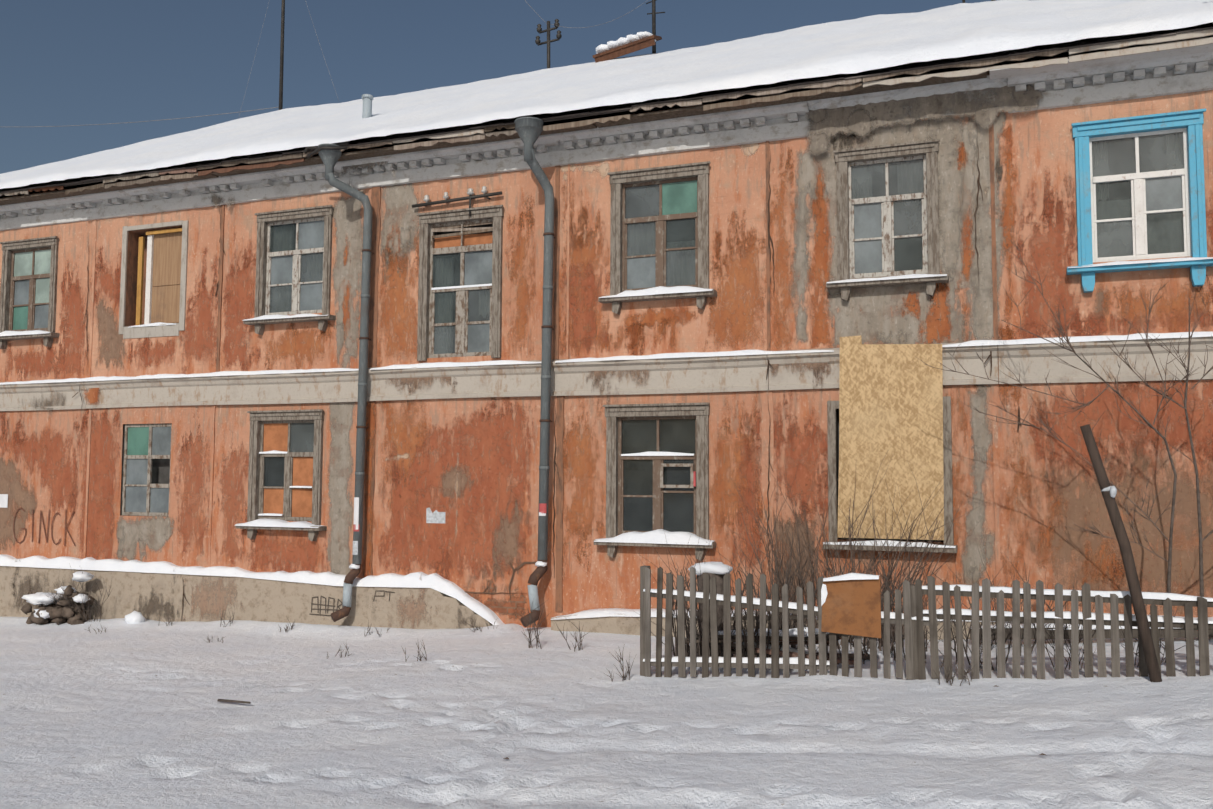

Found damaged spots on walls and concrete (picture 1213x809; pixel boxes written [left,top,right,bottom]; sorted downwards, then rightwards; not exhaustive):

peeling [1012,84,1043,109]
flaking render [129,189,364,371]
peeling [377,169,419,367]
peeling [559,200,625,355]
flaking render [708,103,1213,351]
crack [974,125,983,276]
flaking render [0,402,355,575]
peeling [379,397,533,619]
peeling [951,379,1213,598]